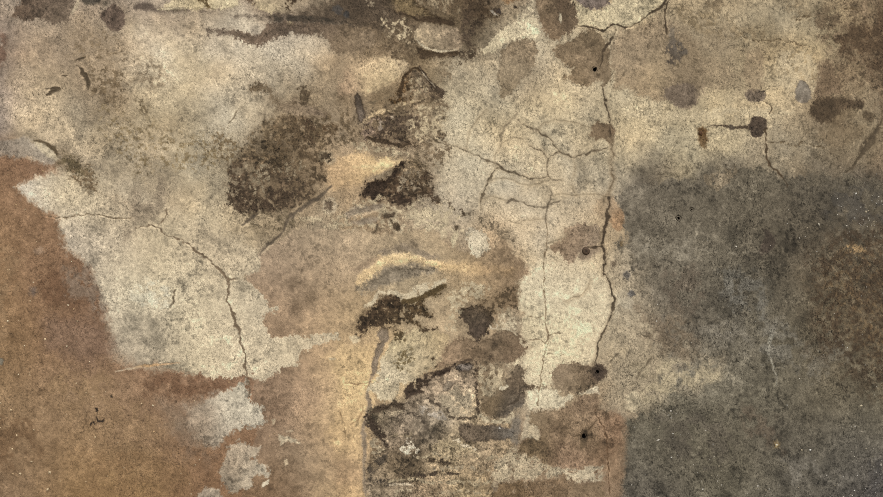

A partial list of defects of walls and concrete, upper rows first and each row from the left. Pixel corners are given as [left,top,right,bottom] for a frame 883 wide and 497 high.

leakage [404,0,462,18]
leakage [574,0,613,11]
leakage [610,0,883,155]
leakage [11,0,424,254]
crack [760,98,883,190]
crack [41,207,255,402]
crack [258,183,334,259]
leakage [348,276,526,345]
crack [426,0,672,408]
leakage [609,241,641,301]
leakage [758,227,777,256]
spalling [359,221,632,497]